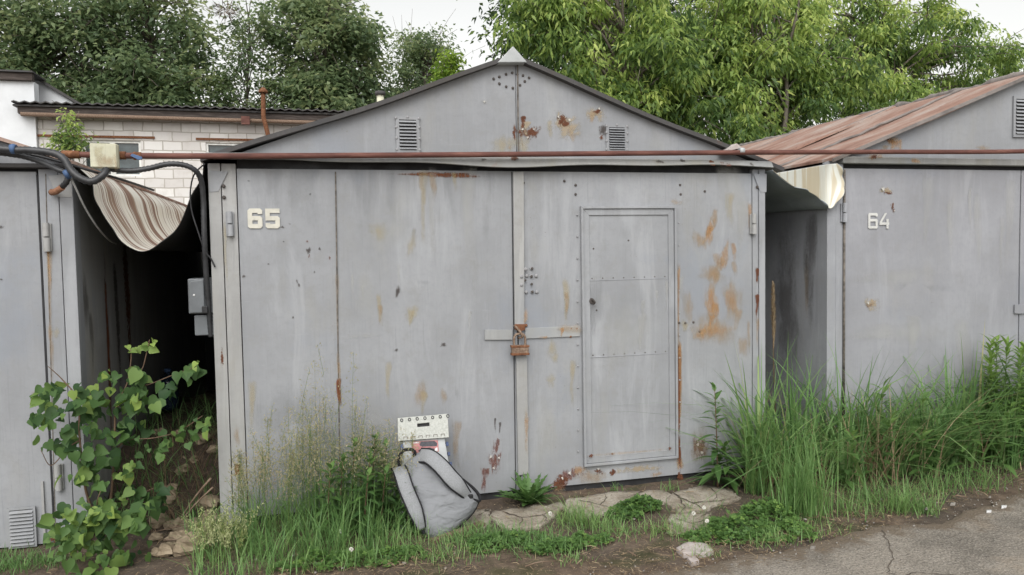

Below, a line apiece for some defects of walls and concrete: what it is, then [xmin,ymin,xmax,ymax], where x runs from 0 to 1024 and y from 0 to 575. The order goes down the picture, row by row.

rust [517,116,540,139]
rust [669,346,683,480]
rust [589,454,654,476]
rust [554,467,582,489]